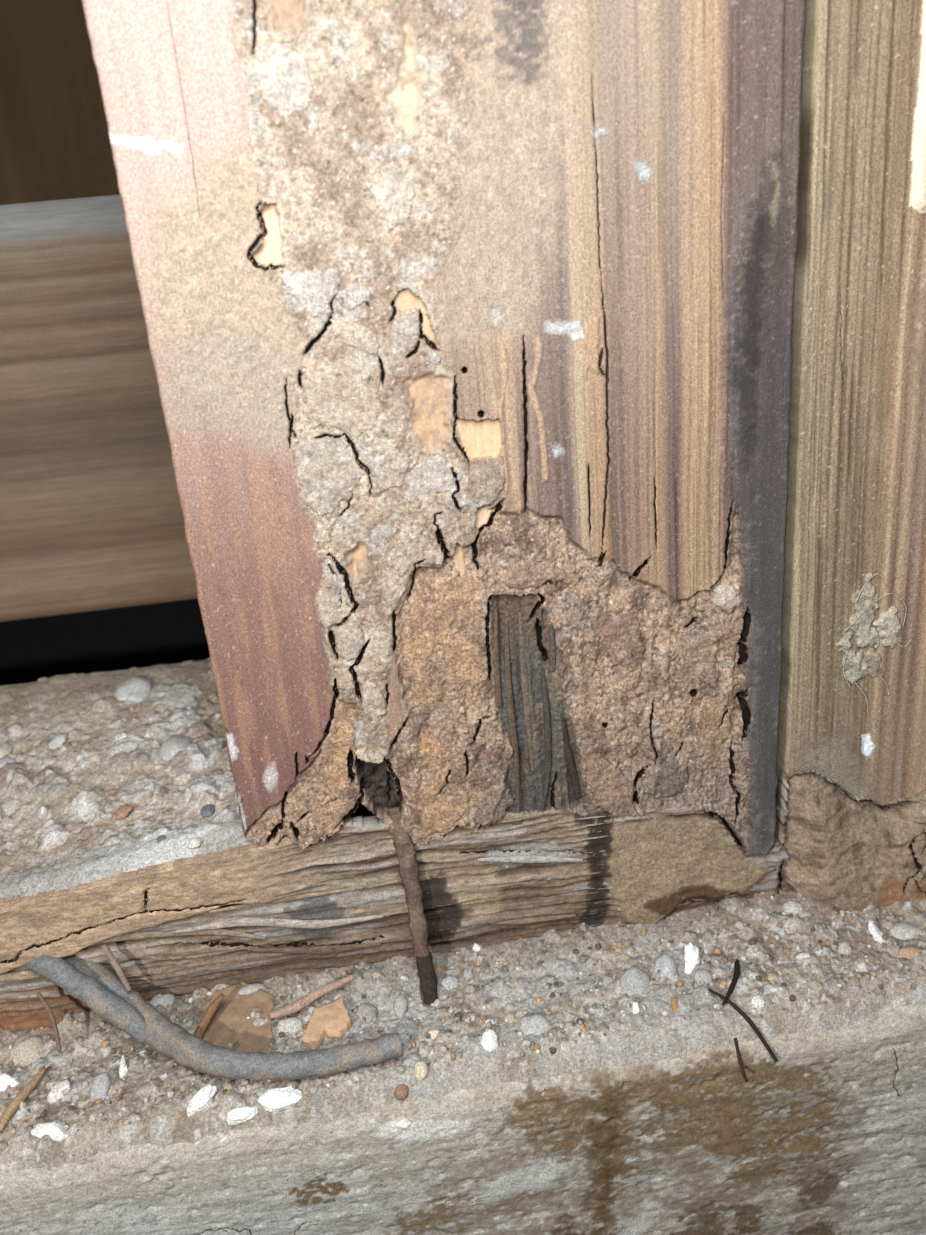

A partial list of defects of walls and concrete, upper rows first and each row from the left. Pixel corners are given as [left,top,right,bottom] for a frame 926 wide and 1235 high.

crack [366,300,438,386]
crack [587,98,610,566]
crack [284,297,373,516]
crack [633,478,657,577]
crack [724,507,732,568]
crack [267,336,528,843]
crack [530,581,552,661]
crack [633,703,683,805]
crack [721,609,751,822]
water stain [369,1117,472,1145]
water stain [436,1155,572,1209]
water stain [624,1195,664,1235]